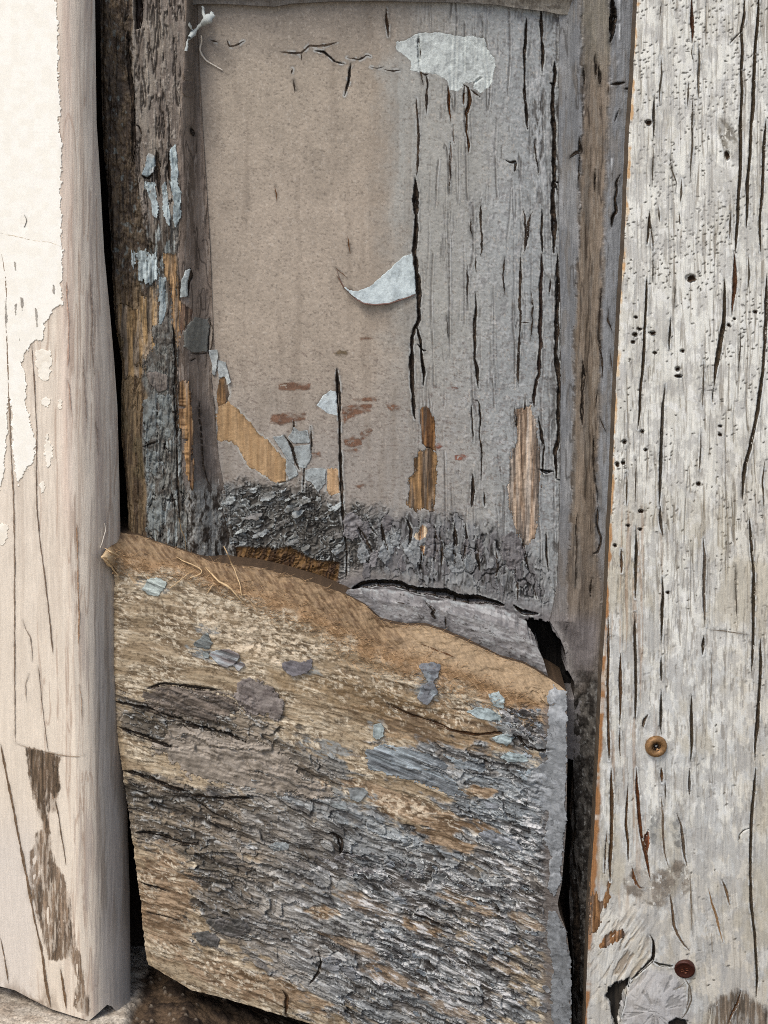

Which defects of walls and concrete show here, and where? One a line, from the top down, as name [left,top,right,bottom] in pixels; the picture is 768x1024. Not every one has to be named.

peeling [396,32,496,93]
peeling [0,0,64,486]
peeling [142,144,182,227]
crack [282,41,480,418]
peeling [115,249,484,578]
peeling [501,405,542,581]
crack [336,0,768,1023]
peeling [141,633,368,810]
peeling [365,723,487,796]
peeling [467,684,568,897]
peeling [192,917,251,947]
peeling [314,850,572,1024]